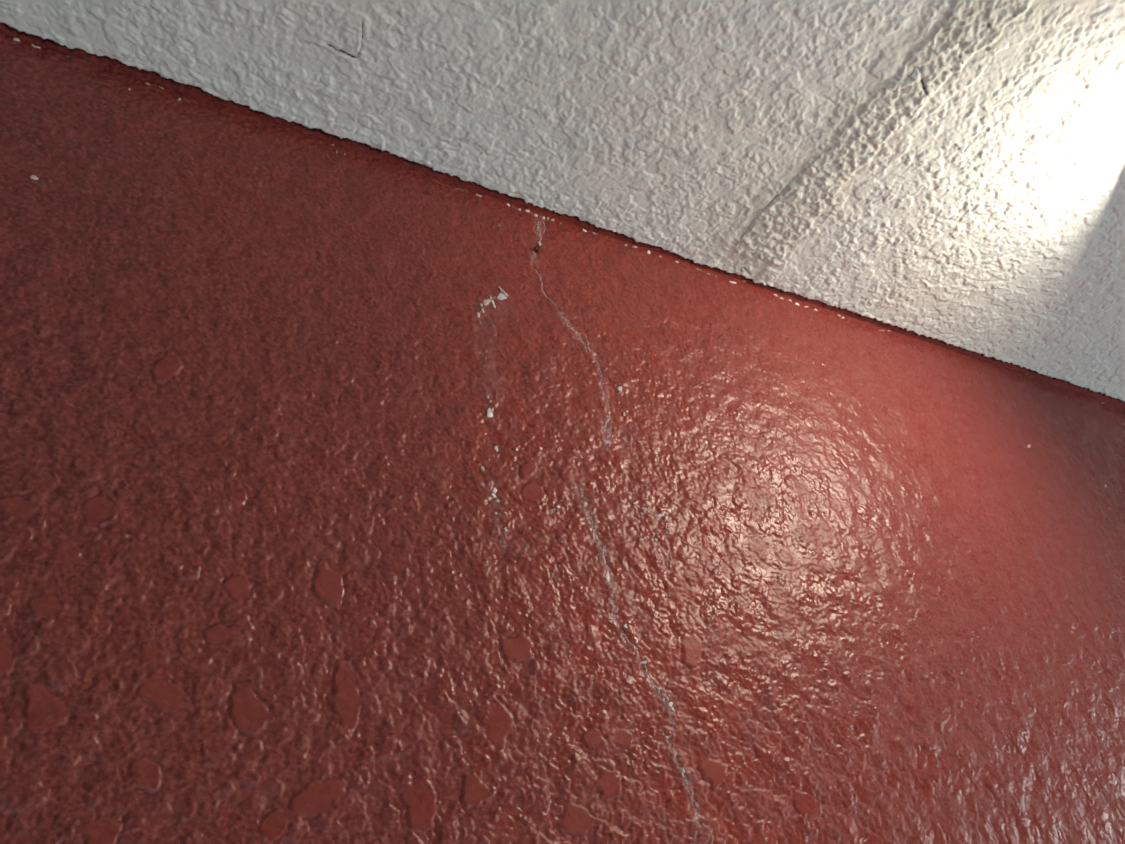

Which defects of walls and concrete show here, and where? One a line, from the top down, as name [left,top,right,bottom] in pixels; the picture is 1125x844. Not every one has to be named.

crack [533,221,612,444]
crack [581,489,700,826]